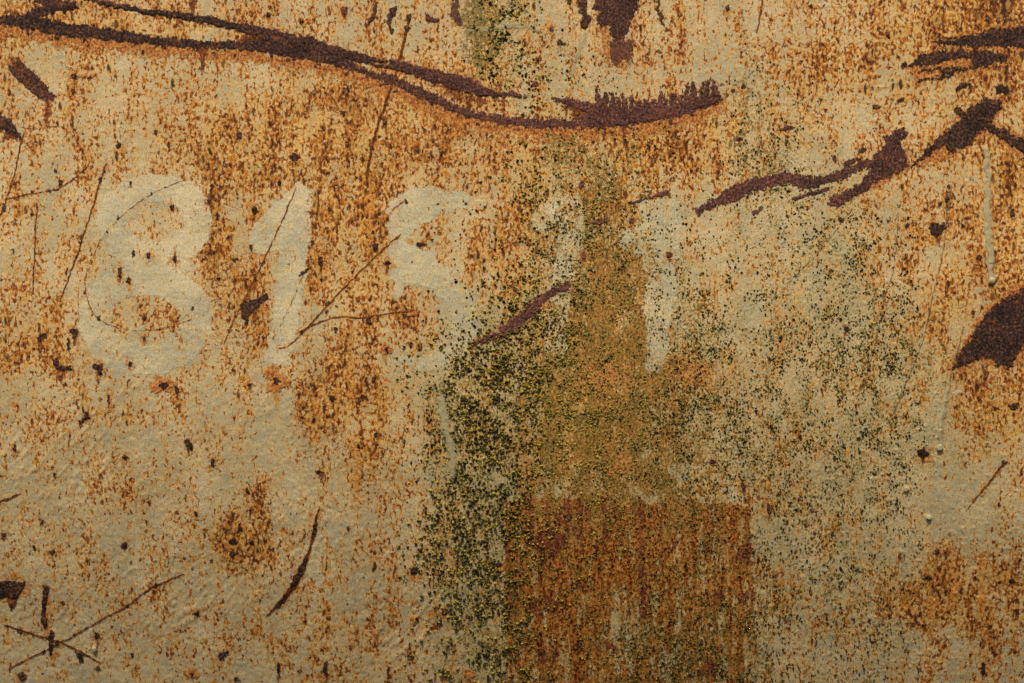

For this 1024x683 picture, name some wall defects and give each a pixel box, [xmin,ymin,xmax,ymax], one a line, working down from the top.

corrosion [0,0,1024,464]
corrosion [263,322,397,511]
corrosion [468,151,758,683]
corrosion [203,482,285,578]
corrosion [854,530,1024,654]